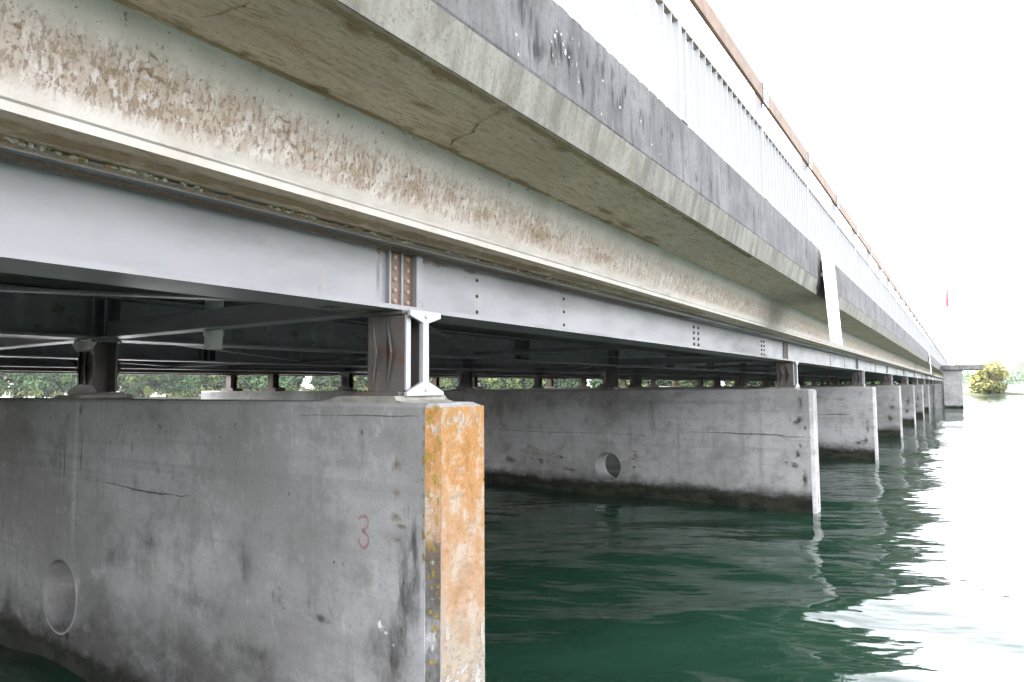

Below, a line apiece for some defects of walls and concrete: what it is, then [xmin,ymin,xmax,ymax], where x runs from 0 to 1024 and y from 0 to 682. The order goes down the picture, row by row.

crack [451,107,507,146]
crack [709,432,795,440]
crack [107,482,183,497]
corrosion [441,405,485,682]